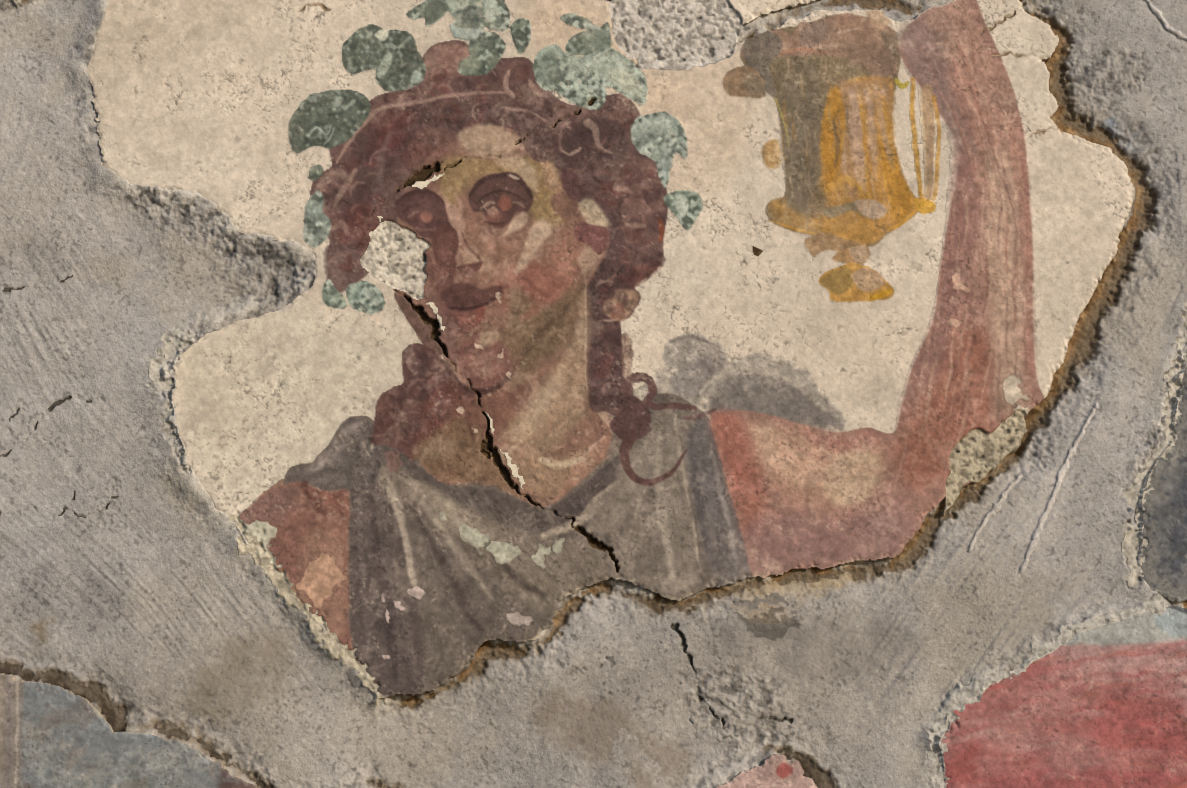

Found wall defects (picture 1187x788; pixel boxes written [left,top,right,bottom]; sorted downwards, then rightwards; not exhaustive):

spalling [609,0,744,70]
spalling [127,187,315,317]
spalling [360,221,430,300]
crack [404,296,448,358]
crack [475,391,620,572]
spalling [942,375,1030,516]
spalling [1122,302,1187,587]
spalling [230,511,387,705]
crack [671,624,725,726]
spalling [672,658,794,757]
crack [768,716,793,724]
spalling [927,590,1168,788]